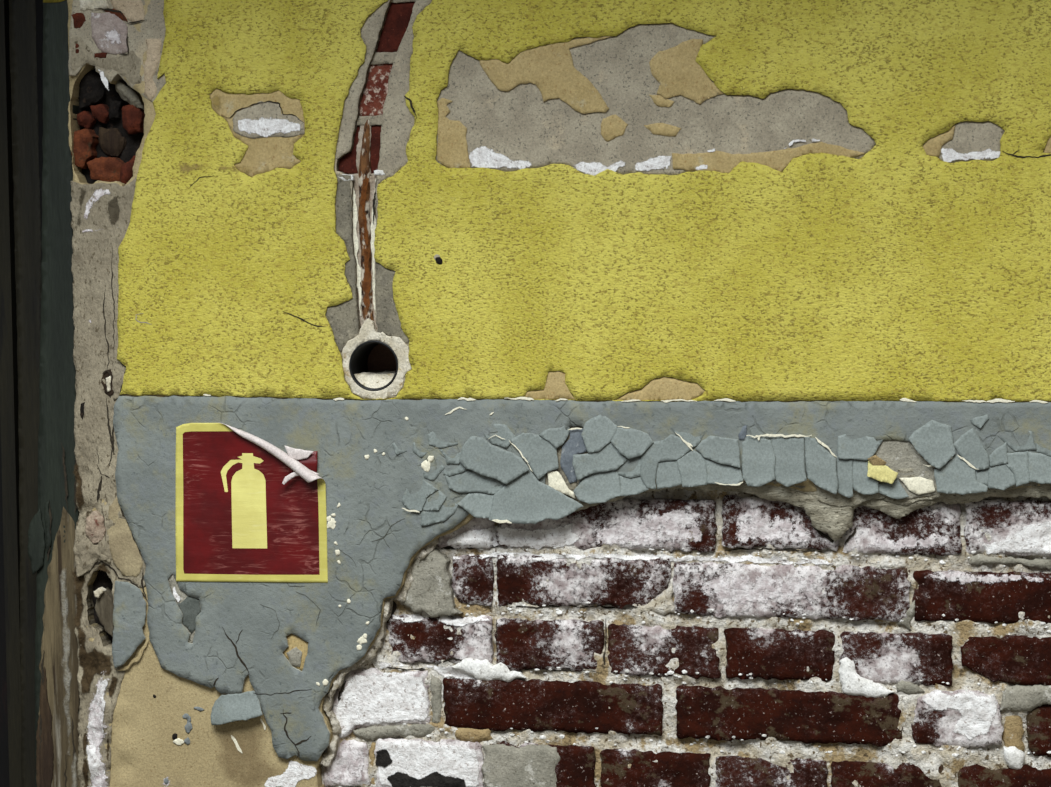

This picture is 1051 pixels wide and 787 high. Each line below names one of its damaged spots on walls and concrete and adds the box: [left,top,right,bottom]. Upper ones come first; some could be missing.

peeling [210,88,305,177]
peeling [436,23,876,176]
peeling [923,121,1005,163]
crack [1003,150,1051,158]
flaking render [28,0,166,787]
damp [447,505,833,608]
flaking render [316,398,1051,787]
damp [859,531,949,554]
damp [929,571,1043,585]
damp [982,521,1051,555]
crack [222,627,311,760]
damp [265,662,479,787]